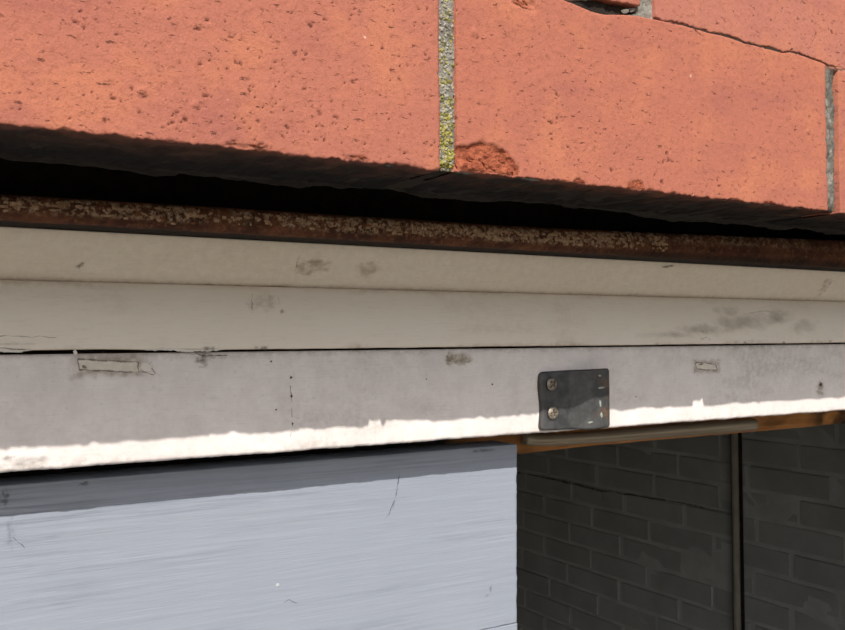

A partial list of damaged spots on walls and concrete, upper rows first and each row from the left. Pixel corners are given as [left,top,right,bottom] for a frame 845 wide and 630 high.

crack [659,19,843,70]
spalling [454,142,518,176]
peeling [73,349,155,375]
crack [517,472,731,514]